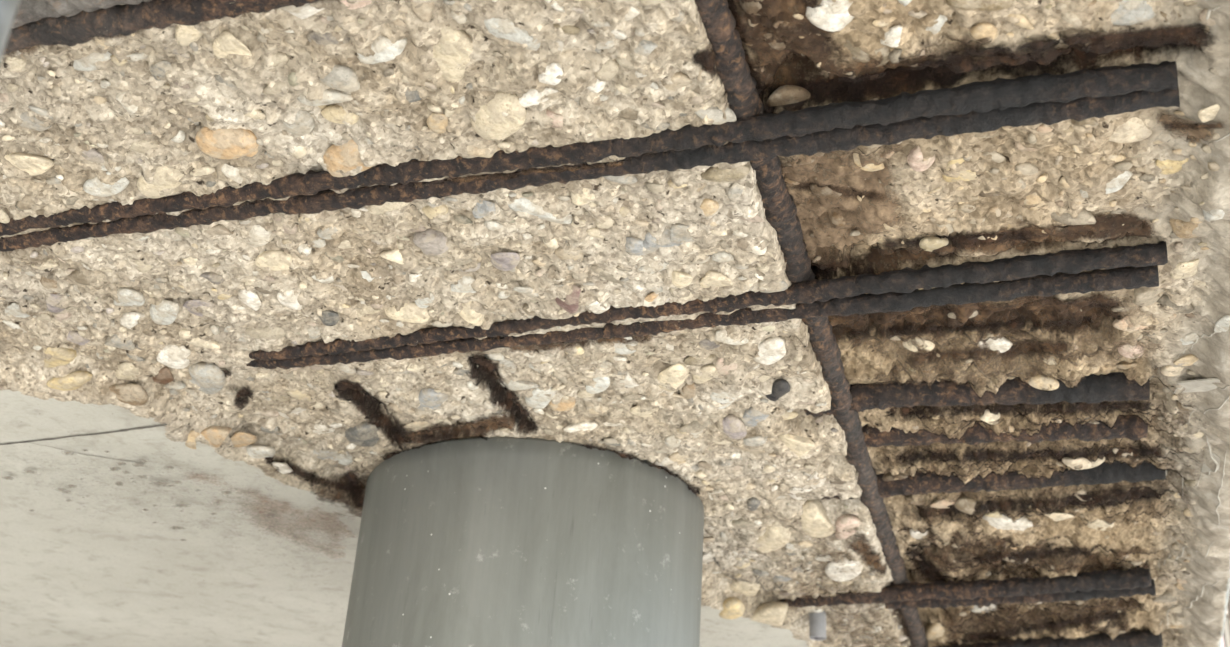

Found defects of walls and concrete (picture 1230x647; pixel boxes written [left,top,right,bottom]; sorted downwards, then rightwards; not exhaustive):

corrosion [693,42,727,97]
corrosion [727,0,989,101]
spalling [760,85,811,114]
corrosion [780,146,1153,280]
spalling [0,155,912,647]
crack [0,423,168,463]
spalling [867,438,1140,484]
corrosion [857,309,1195,583]
corrosion [795,535,909,647]
spalling [898,607,966,647]
corrosion [936,597,1144,646]
spalling [1057,619,1108,639]